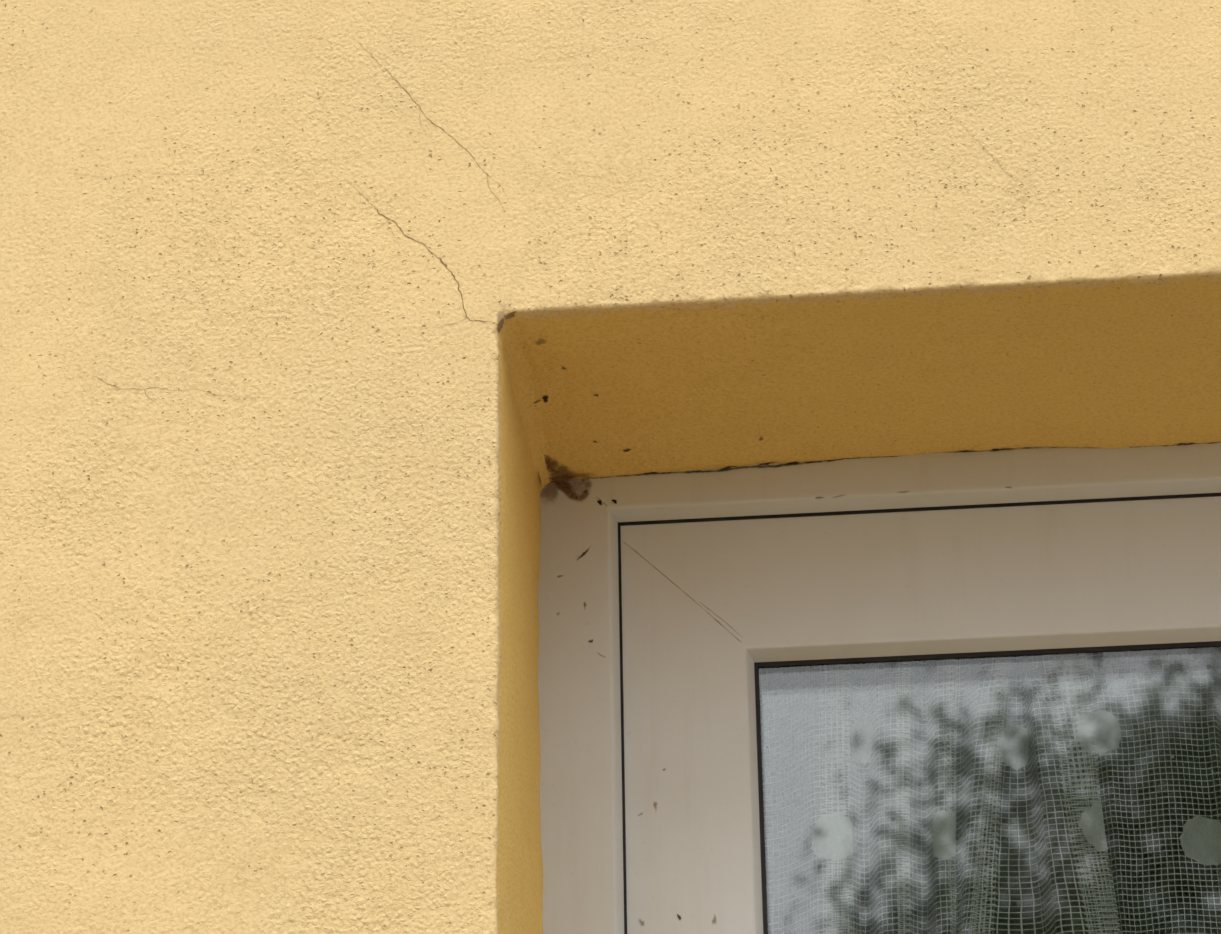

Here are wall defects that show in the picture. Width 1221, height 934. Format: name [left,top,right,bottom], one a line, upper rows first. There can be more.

crack [405,90,479,166]
crack [376,209,489,322]